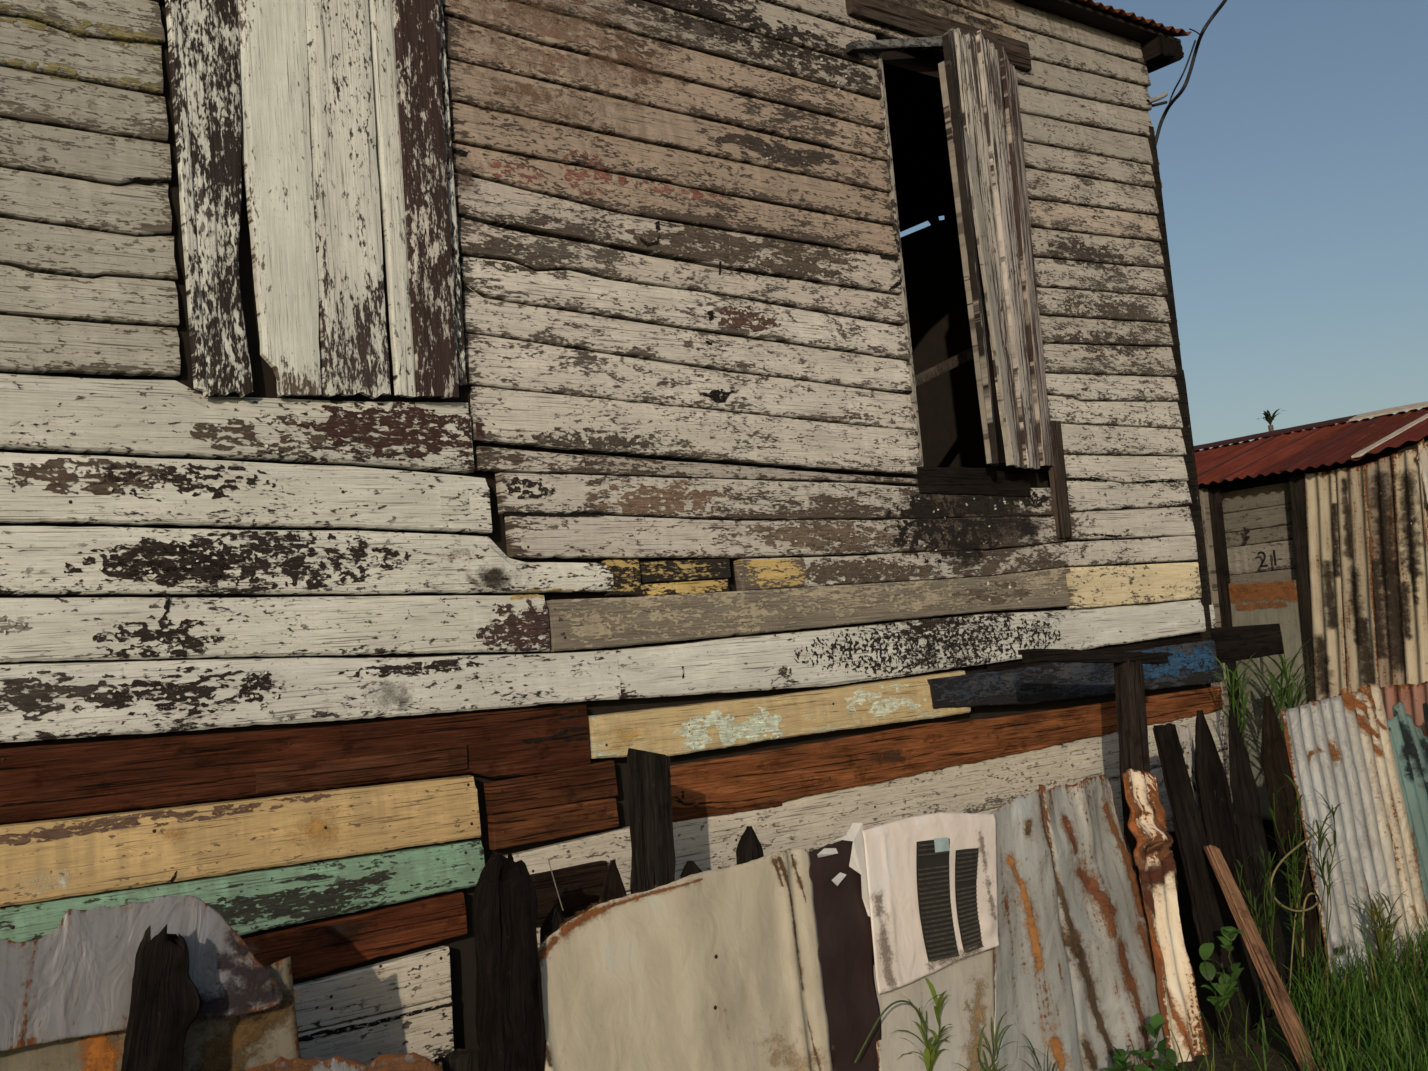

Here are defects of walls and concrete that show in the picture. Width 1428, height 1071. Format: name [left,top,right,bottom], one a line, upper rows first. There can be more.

peeling [624,0,881,92]
peeling [0,401,495,503]
peeling [504,477,557,499]
peeling [516,427,654,457]
peeling [64,531,411,592]
peeling [0,615,285,721]
peeling [338,588,575,679]
peeling [672,707,787,751]
rust [1307,742,1341,762]
rust [1340,687,1386,757]
rust [1006,855,1042,971]
rust [1025,779,1195,1071]